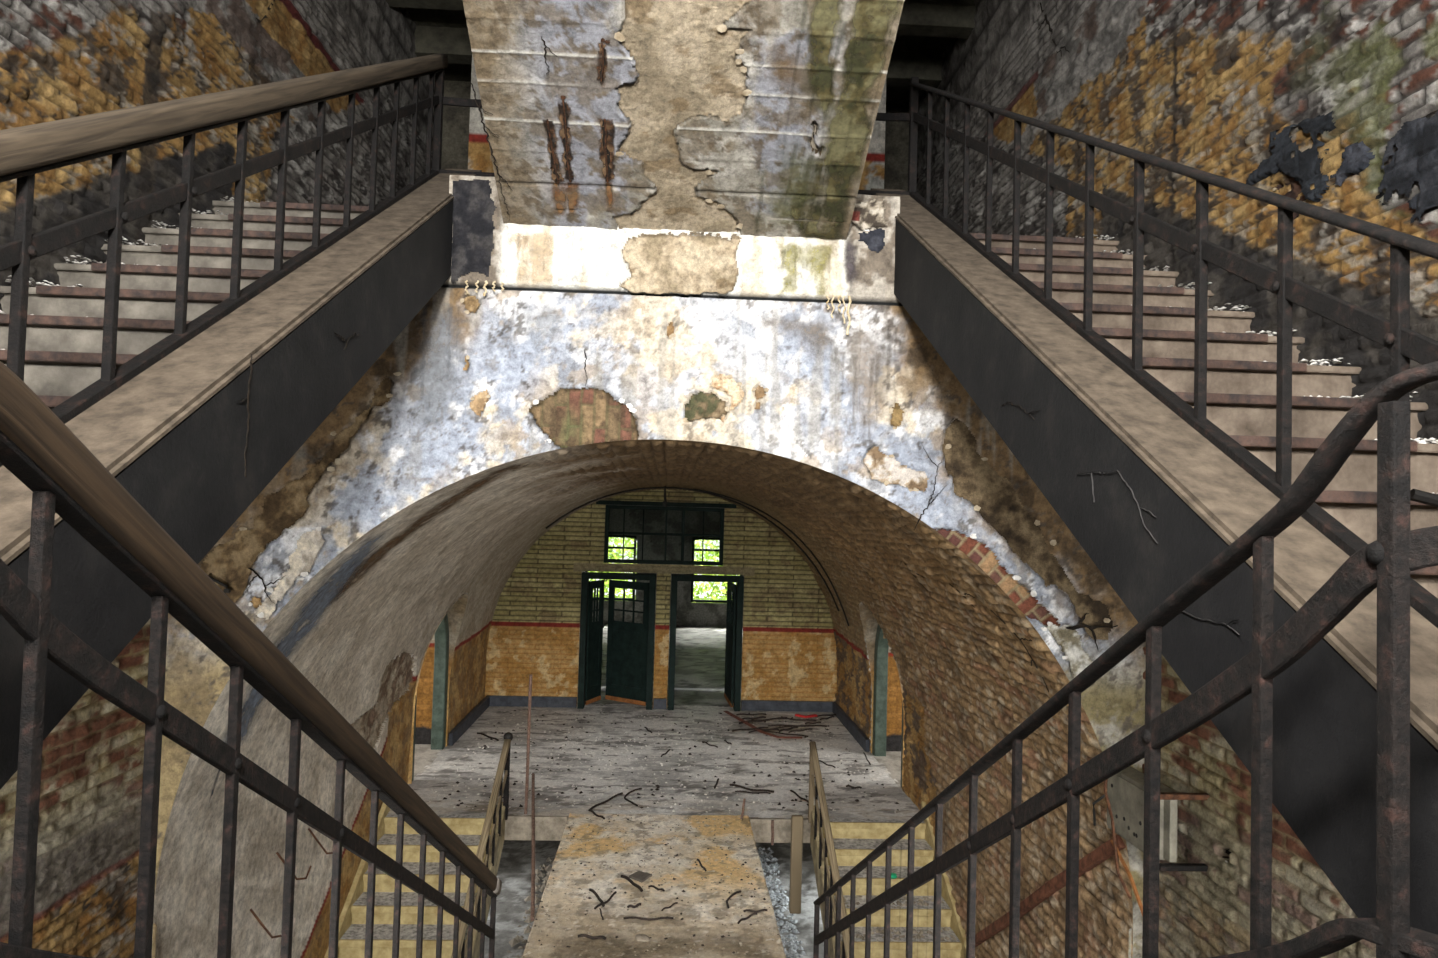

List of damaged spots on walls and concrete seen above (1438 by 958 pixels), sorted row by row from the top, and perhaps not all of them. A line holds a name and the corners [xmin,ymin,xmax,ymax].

corrosion [596,38,610,83]
corrosion [543,96,579,214]
corrosion [599,118,615,210]
peeling [614,0,752,295]
spalling [1272,178,1306,220]
water stain [417,316,452,420]
water stain [465,280,504,296]
flaking render [529,387,639,448]
flaking render [683,374,769,423]
water stain [765,242,882,423]
peeling [935,418,1113,688]
crack [1081,470,1158,544]